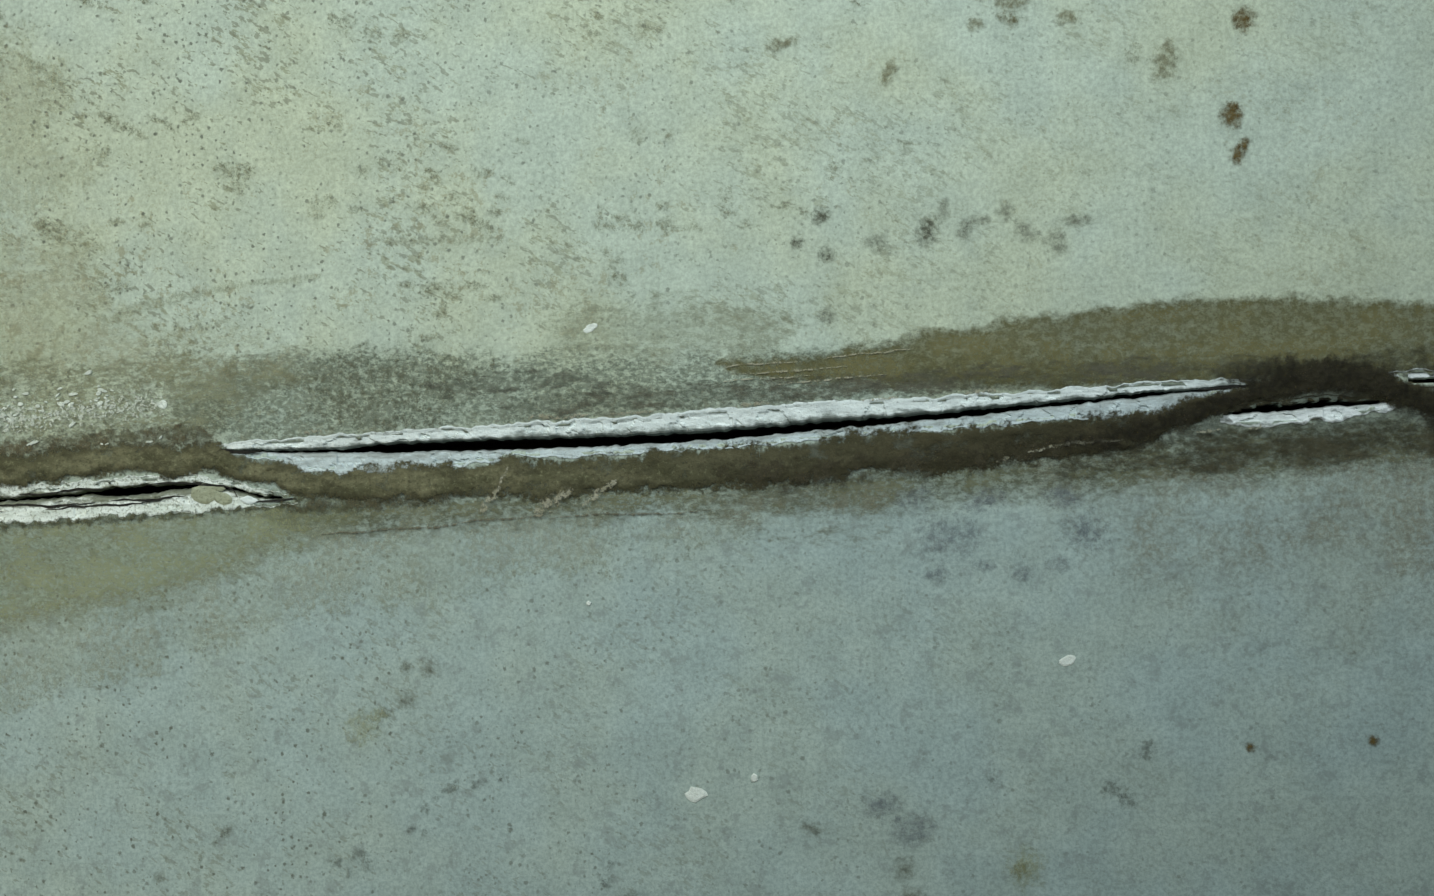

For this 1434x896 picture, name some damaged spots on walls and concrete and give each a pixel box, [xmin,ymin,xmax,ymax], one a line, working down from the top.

crack [0,368,1434,525]
leakage [0,297,1434,624]